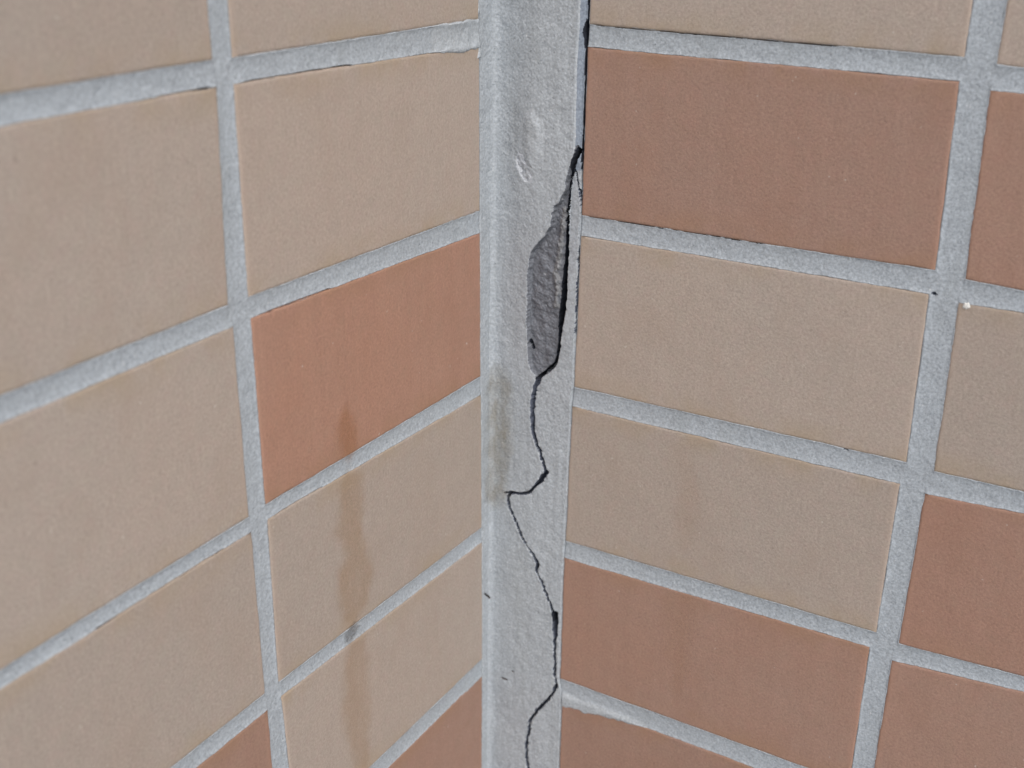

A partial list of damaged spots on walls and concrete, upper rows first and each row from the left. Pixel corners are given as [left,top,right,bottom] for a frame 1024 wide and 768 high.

spalling [526,145,584,380]
crack [504,378,559,768]